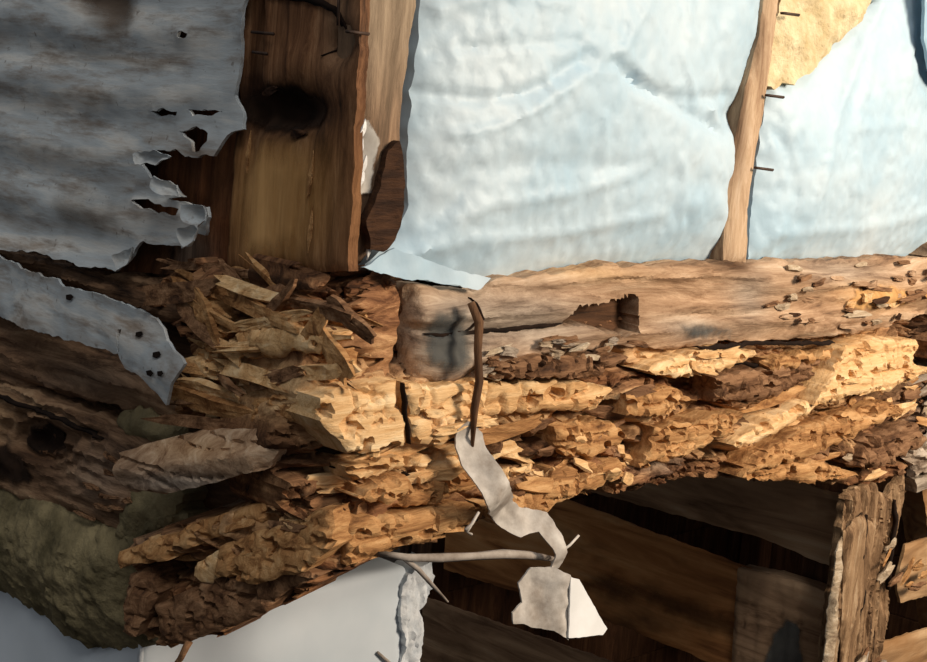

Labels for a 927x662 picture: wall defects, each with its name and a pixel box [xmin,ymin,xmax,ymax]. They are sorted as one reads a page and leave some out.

peeling [133,150,172,165]
peeling [149,176,208,248]
peeling [112,247,134,270]
crack [390,382,419,453]
crack [315,447,357,468]
crack [860,499,899,618]
water stain [765,620,802,662]